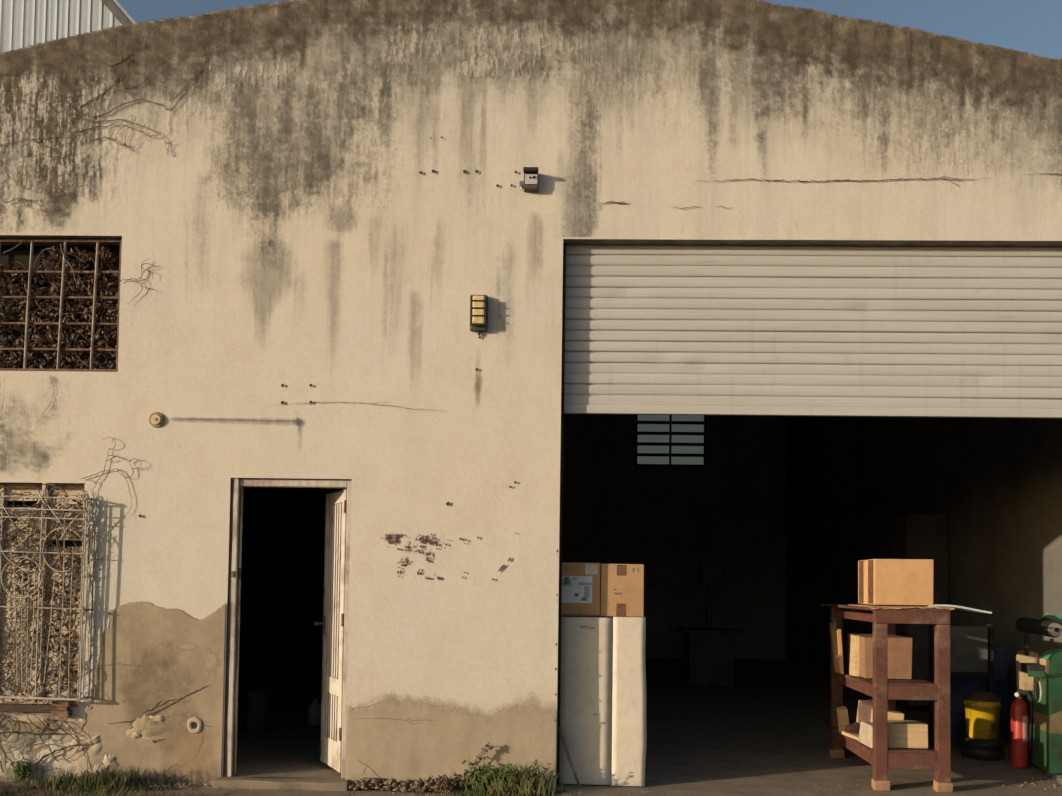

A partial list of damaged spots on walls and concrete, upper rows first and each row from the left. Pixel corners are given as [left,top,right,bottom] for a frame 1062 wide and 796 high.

leakage [0,0,1062,237]
crack [697,177,984,186]
crack [0,685,219,779]
flaking render [0,602,226,784]
flaking render [345,694,557,789]